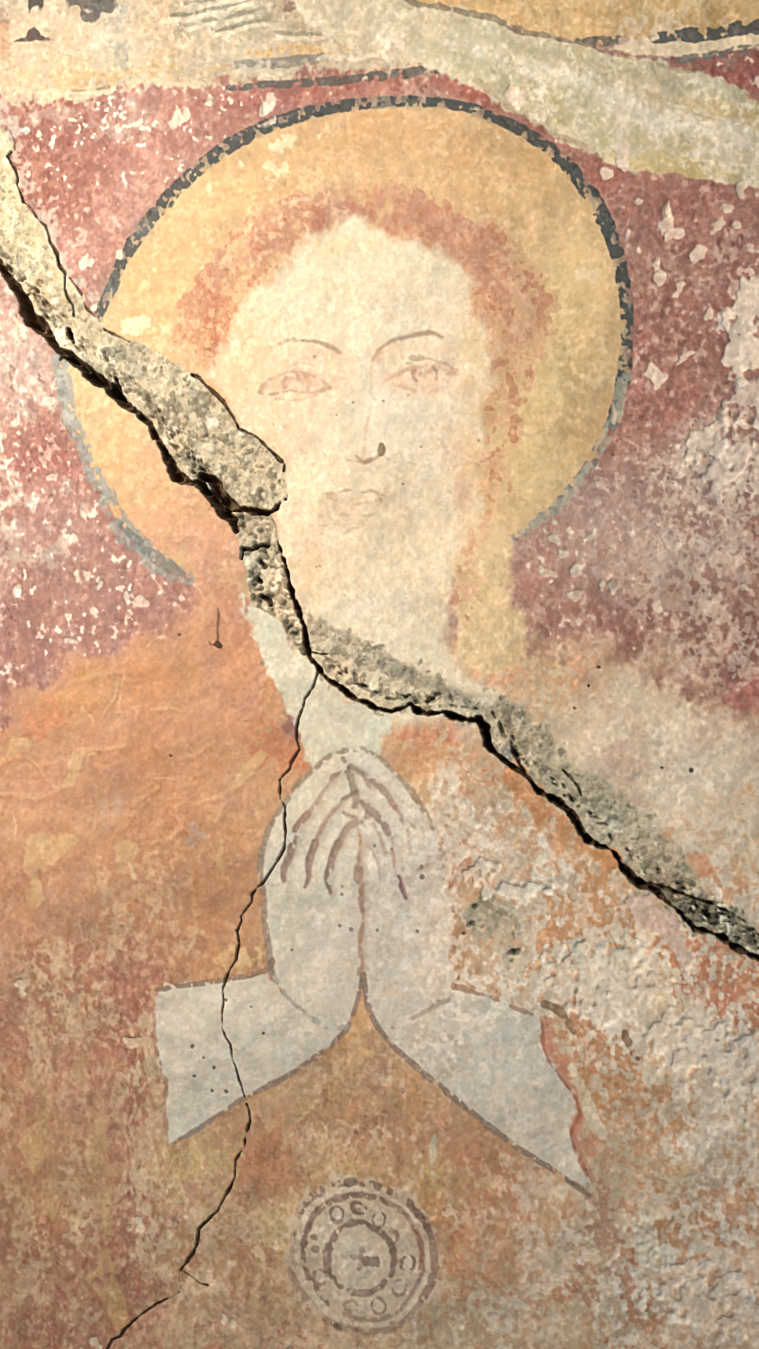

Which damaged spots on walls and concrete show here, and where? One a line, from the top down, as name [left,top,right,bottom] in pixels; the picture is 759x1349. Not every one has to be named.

peeling [504,85,519,104]
peeling [119,115,143,129]
peeling [168,105,191,130]
peeling [258,92,277,128]
crack [0,130,288,535]
spalling [0,122,759,1127]
crack [107,540,759,1349]
peeling [134,1216,145,1233]
peeling [636,1226,759,1341]
peeling [221,1314,237,1329]
peeling [89,1336,103,1349]